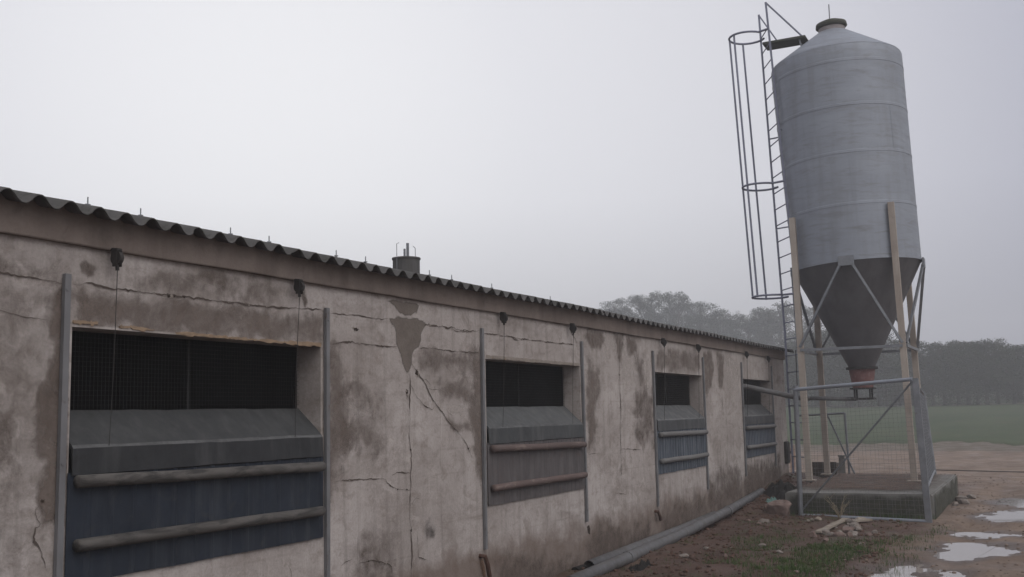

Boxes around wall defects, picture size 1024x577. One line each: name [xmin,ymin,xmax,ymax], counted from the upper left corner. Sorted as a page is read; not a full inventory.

crack [0,272,387,320]
water stain [586,361,600,449]
crack [339,324,577,577]